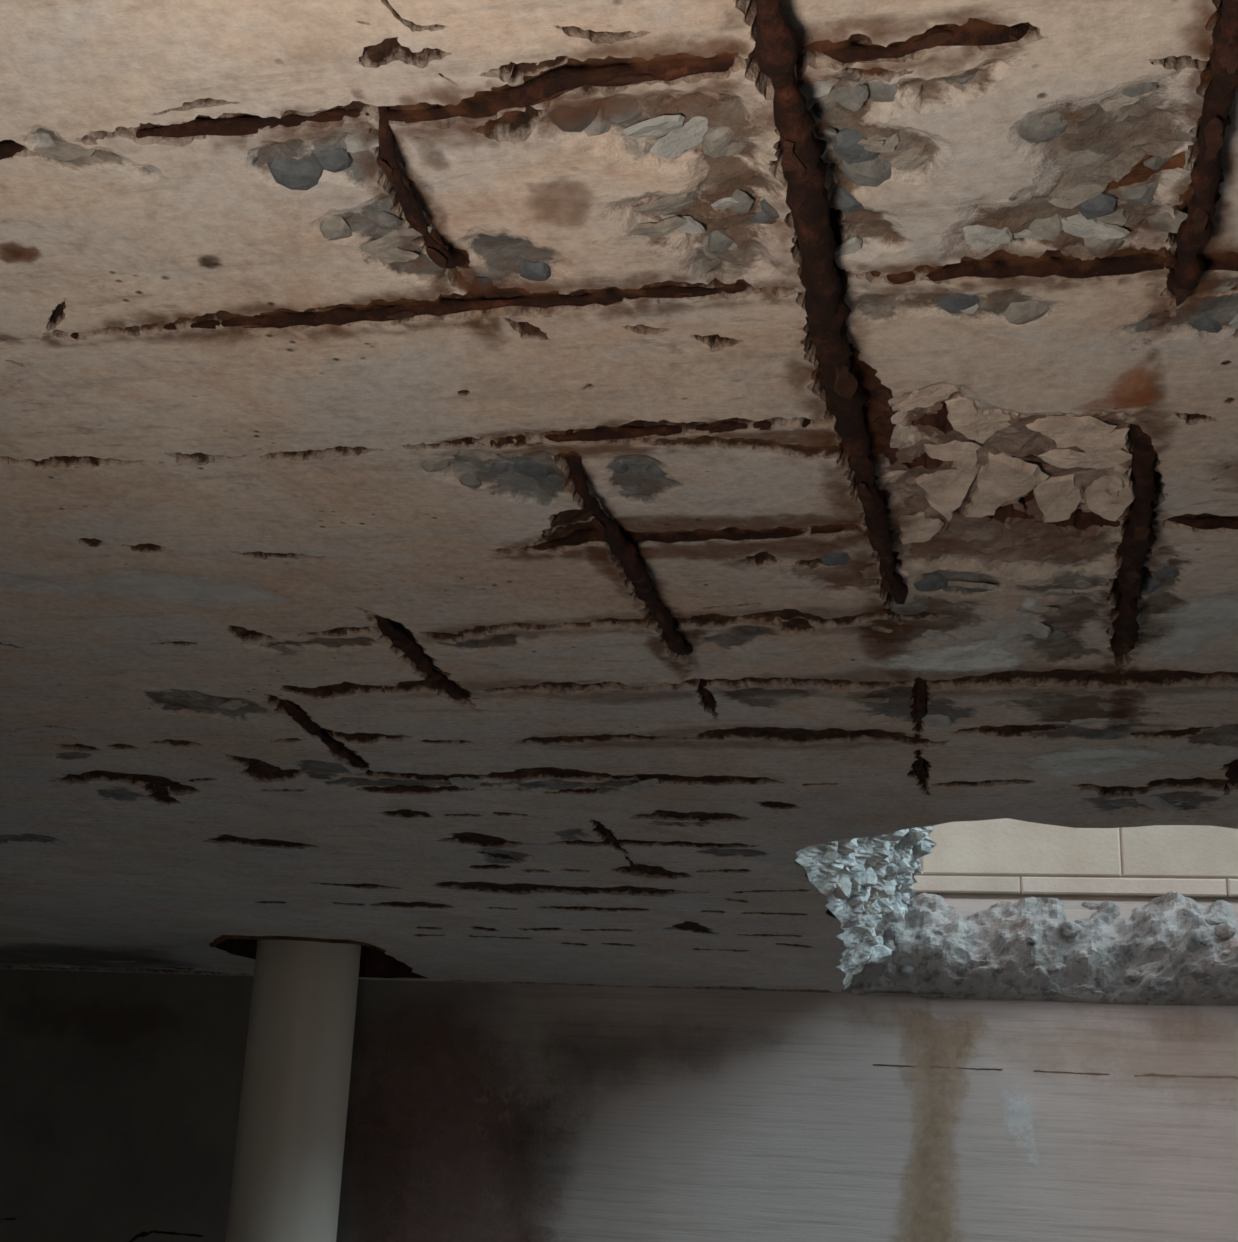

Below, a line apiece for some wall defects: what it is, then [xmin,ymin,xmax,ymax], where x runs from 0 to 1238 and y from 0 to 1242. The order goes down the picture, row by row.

crack [1098,151,1186,193]
spalling [0,0,1238,721]
crack [614,427,843,461]
crack [901,401,956,470]
crack [987,489,1120,530]
crack [76,538,175,554]
crack [149,624,378,647]
crack [280,597,1238,700]
crack [1071,777,1238,799]
crack [43,724,1067,952]
spalling [795,826,1238,1006]
spalling [209,935,427,978]